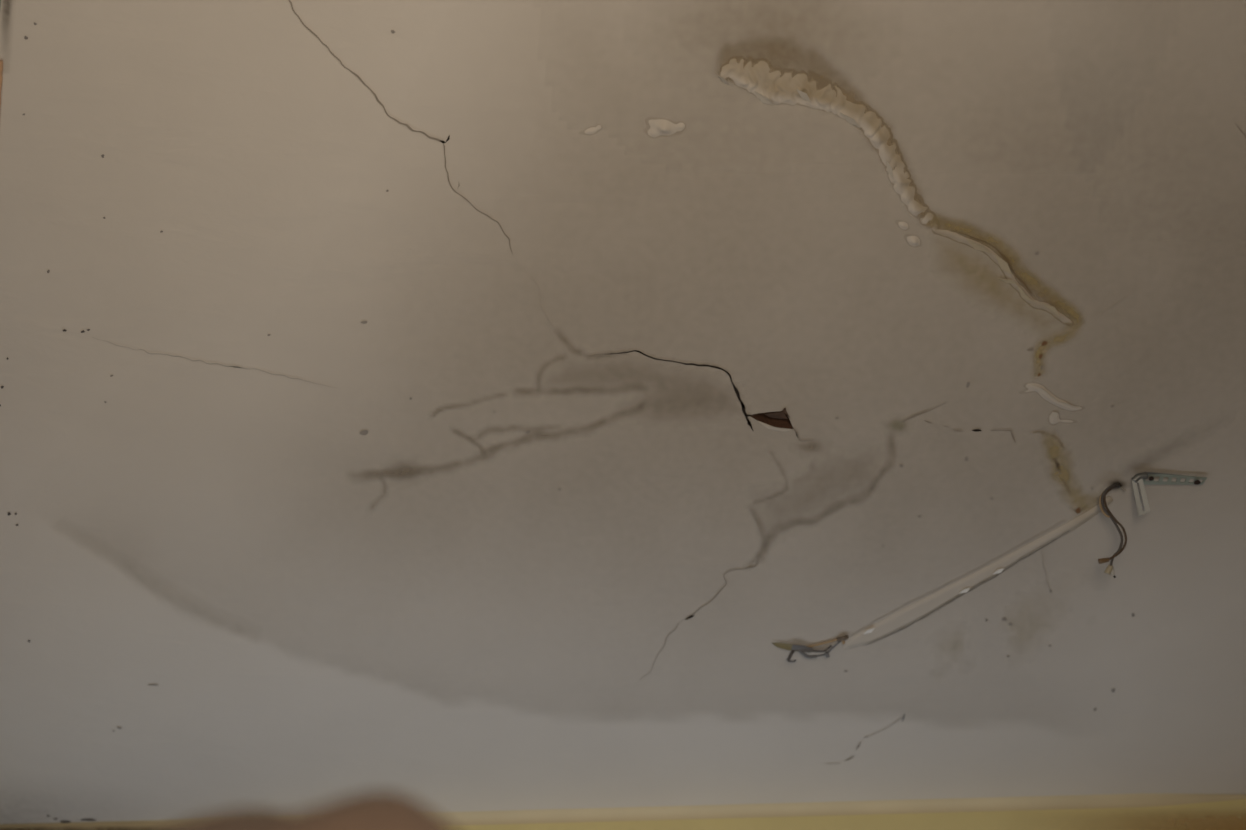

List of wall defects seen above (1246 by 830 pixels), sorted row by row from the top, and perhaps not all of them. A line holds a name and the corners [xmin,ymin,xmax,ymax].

crack [289,0,513,254]
peeling [932,228,1075,326]
crack [93,337,335,388]
crack [588,350,753,430]
crack [641,554,761,679]